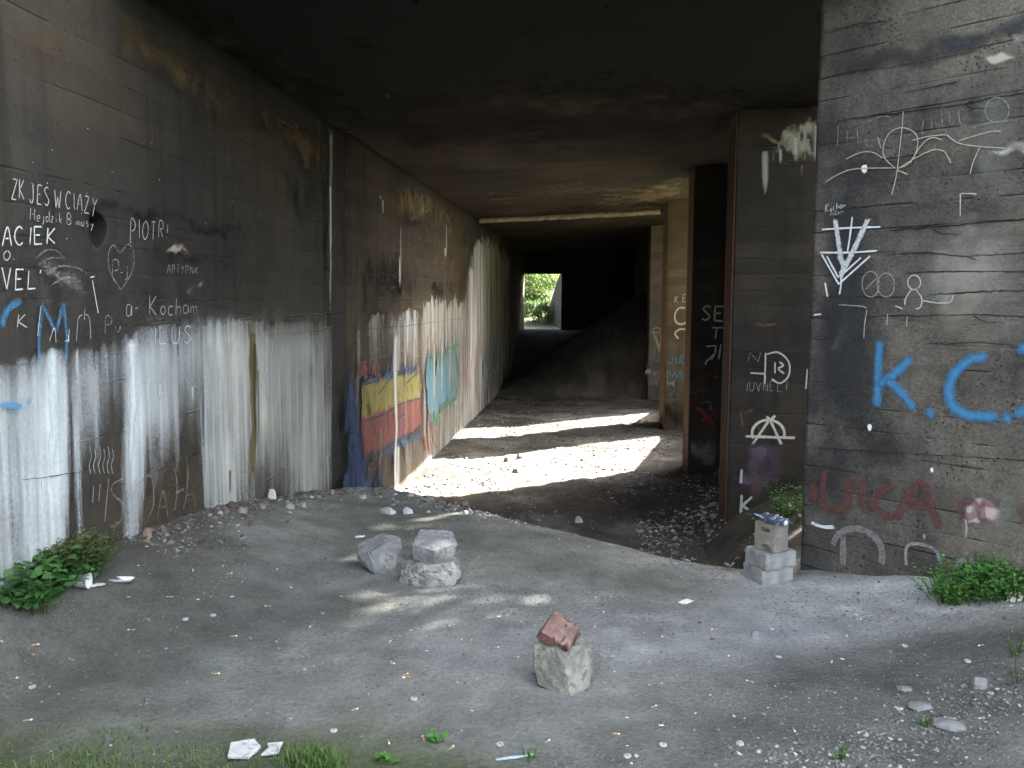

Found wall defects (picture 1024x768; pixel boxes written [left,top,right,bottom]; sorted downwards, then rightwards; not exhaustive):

leakage [262,111,332,301]
leakage [386,179,460,282]
rust [249,327,259,477]